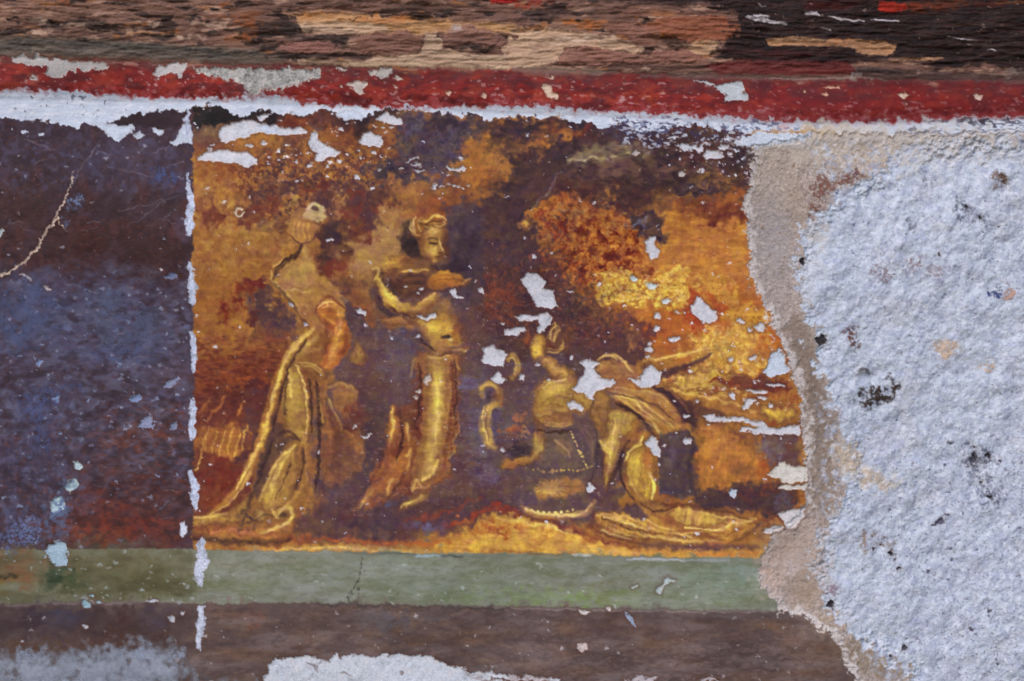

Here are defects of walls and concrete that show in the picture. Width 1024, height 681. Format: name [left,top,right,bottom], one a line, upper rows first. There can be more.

peeling [196,142,258,168]
peeling [307,130,341,163]
peeling [0,64,1024,147]
crack [0,170,76,278]
peeling [183,170,197,237]
peeling [480,271,575,385]
peeling [565,274,719,413]
peeling [127,393,198,442]
spalling [702,128,1024,681]
peeling [178,469,211,588]
peeling [166,603,207,652]
peeling [262,651,561,681]